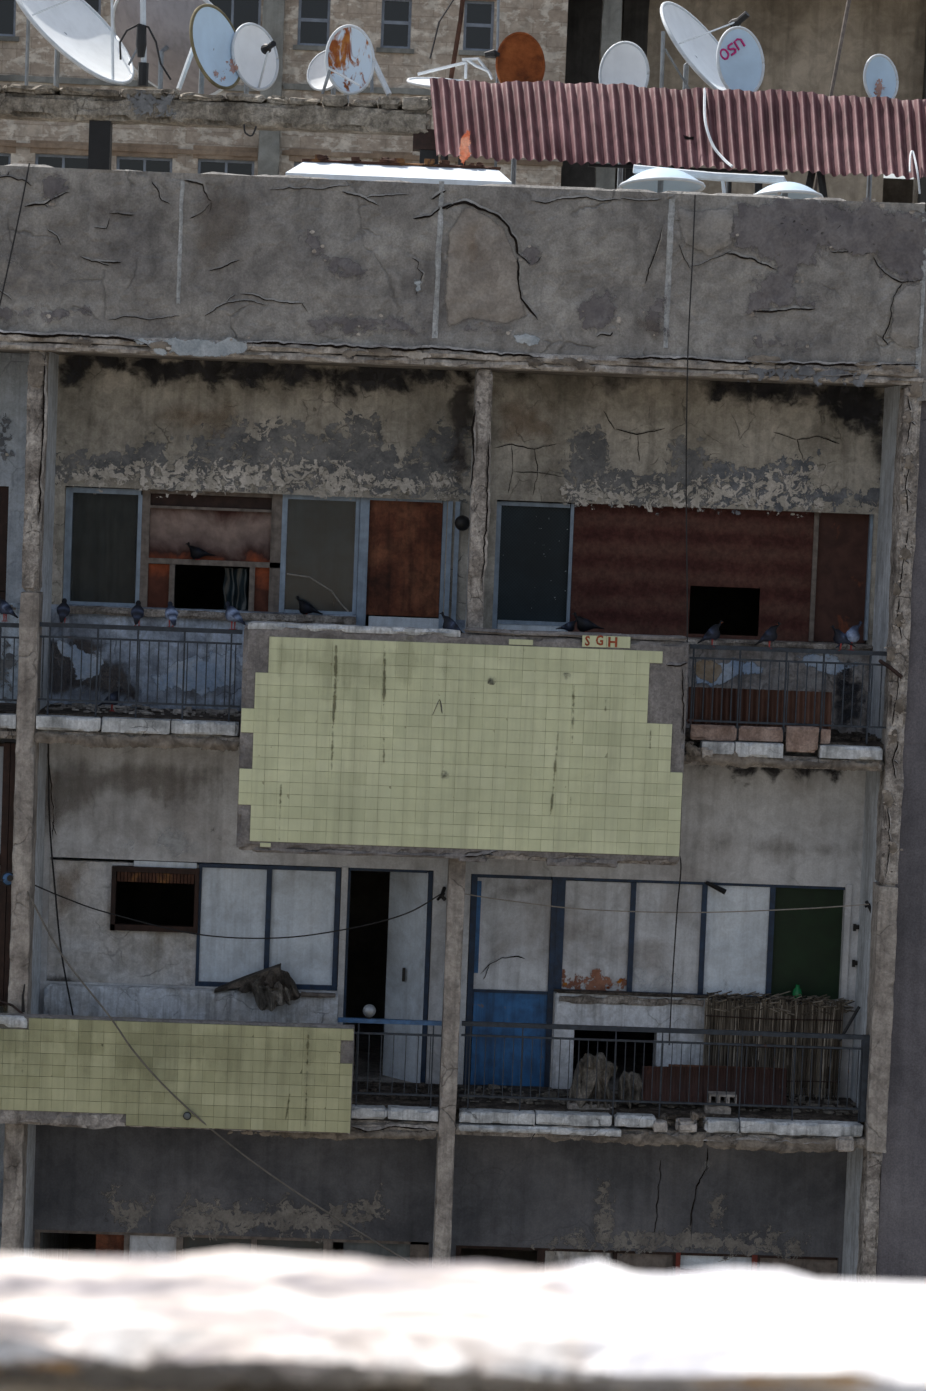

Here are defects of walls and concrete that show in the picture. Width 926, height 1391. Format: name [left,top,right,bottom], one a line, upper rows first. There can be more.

crack [0,172,214,266]
crack [271,185,541,320]
crack [534,195,776,283]
crack [597,221,922,378]
peeling [55,408,472,504]
crack [0,258,544,524]
crack [604,411,665,461]
peeling [558,424,880,518]
crack [897,398,926,638]
rust [561,969,627,991]
spalling [537,1110,856,1154]
crack [654,1134,857,1250]